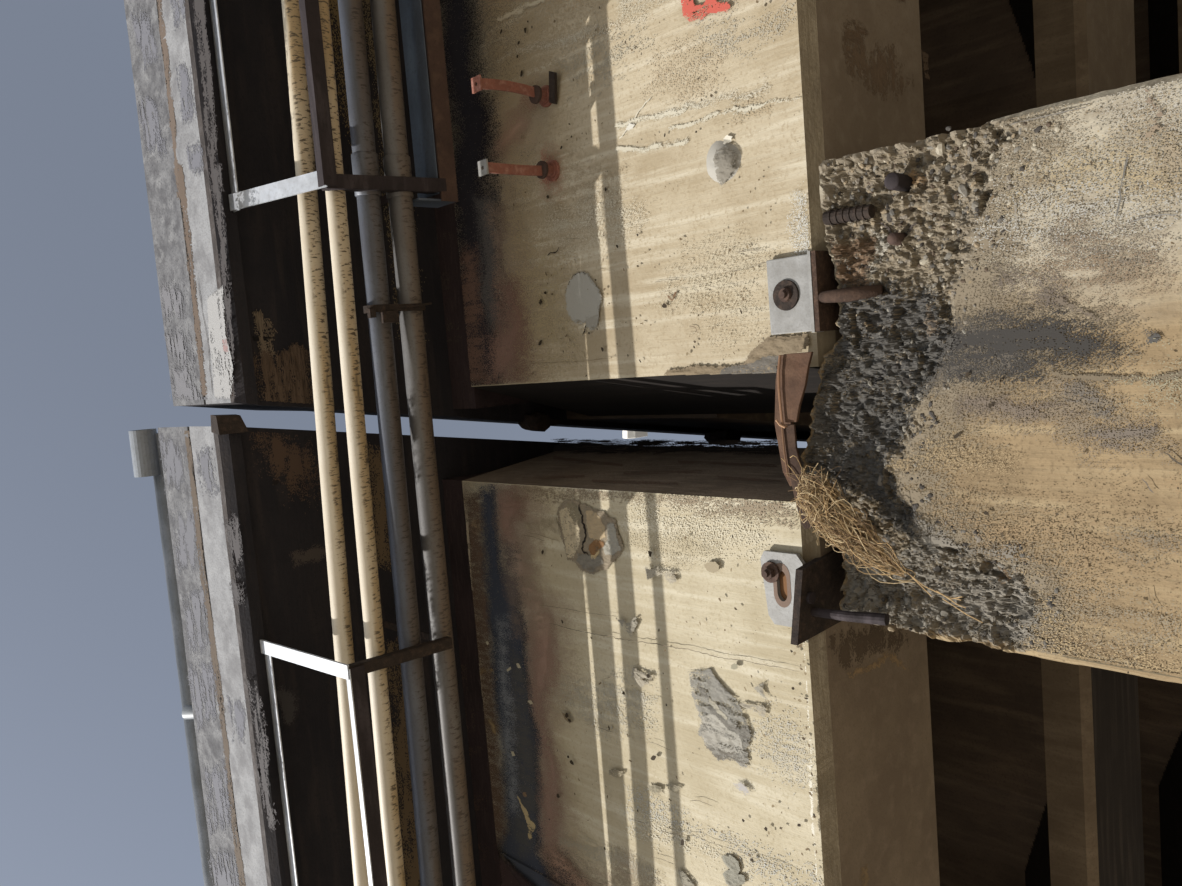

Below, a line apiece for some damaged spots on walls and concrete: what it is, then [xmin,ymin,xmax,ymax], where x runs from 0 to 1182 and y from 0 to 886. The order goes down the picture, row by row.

spalling [713,146,738,185]
spalling [804,116,1062,653]
leakage [1106,338,1182,421]
spalling [551,498,633,574]
leakage [886,431,1182,675]
spalling [599,668,664,695]
spalling [687,663,773,768]